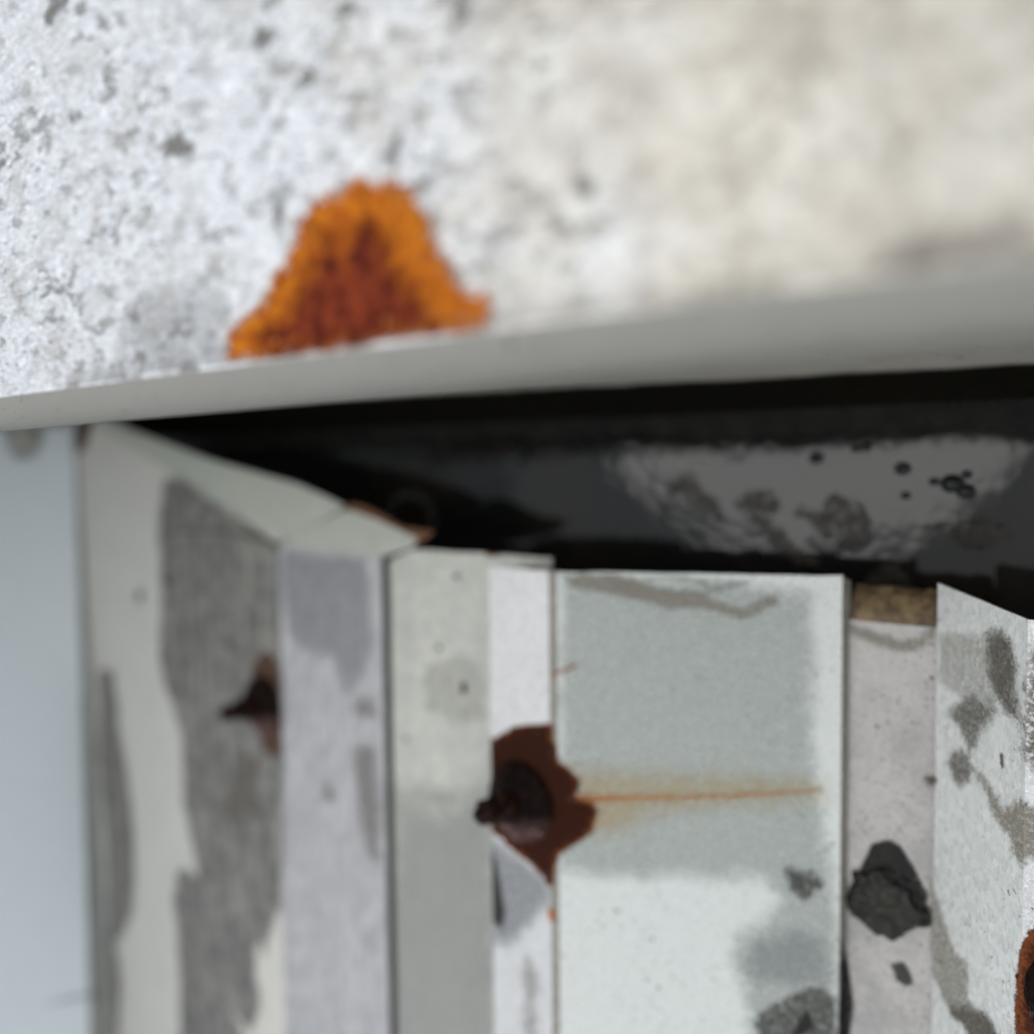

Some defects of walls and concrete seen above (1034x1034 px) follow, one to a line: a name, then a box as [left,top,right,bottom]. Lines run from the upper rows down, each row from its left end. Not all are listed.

corrosion [223,172,493,363]
corrosion [252,651,281,698]
corrosion [260,716,282,760]
corrosion [491,723,821,887]
water stain [948,697,1034,865]
corrosion [1014,929,1034,1034]